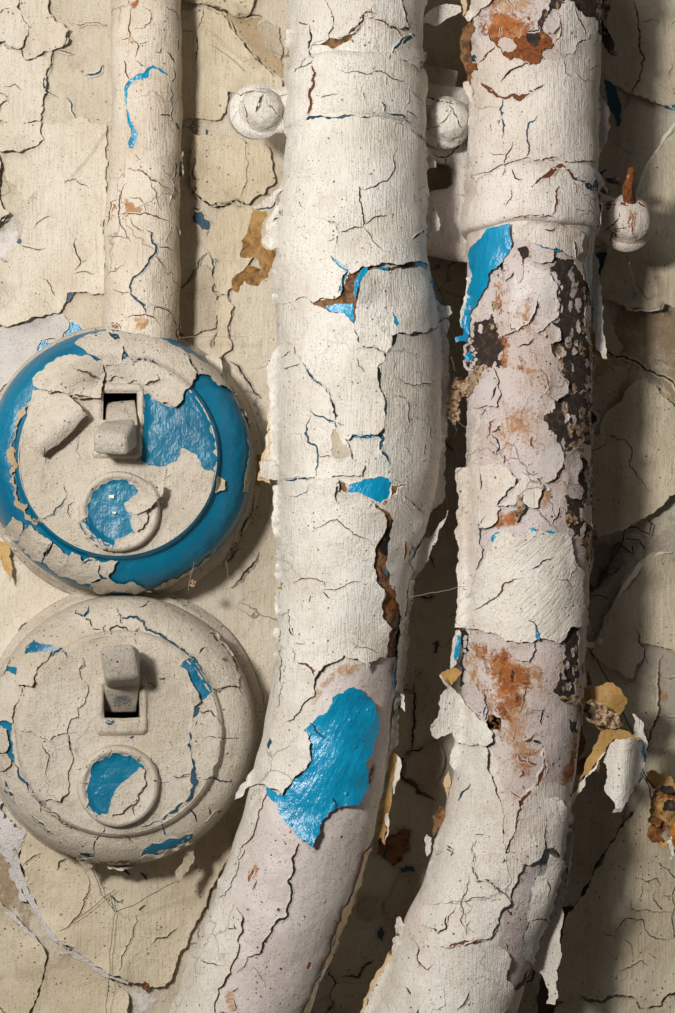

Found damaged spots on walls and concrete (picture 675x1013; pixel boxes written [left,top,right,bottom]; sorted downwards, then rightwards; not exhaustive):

peeling [0,0,108,390]
crack [0,0,463,399]
rust [479,0,621,65]
crack [478,0,647,244]
peeling [584,122,675,359]
peeling [0,116,452,1013]
crack [481,401,507,464]
rust [450,630,541,770]
peeling [360,220,675,1013]
rust [463,242,599,573]
crack [552,468,563,482]
rust [550,626,592,703]